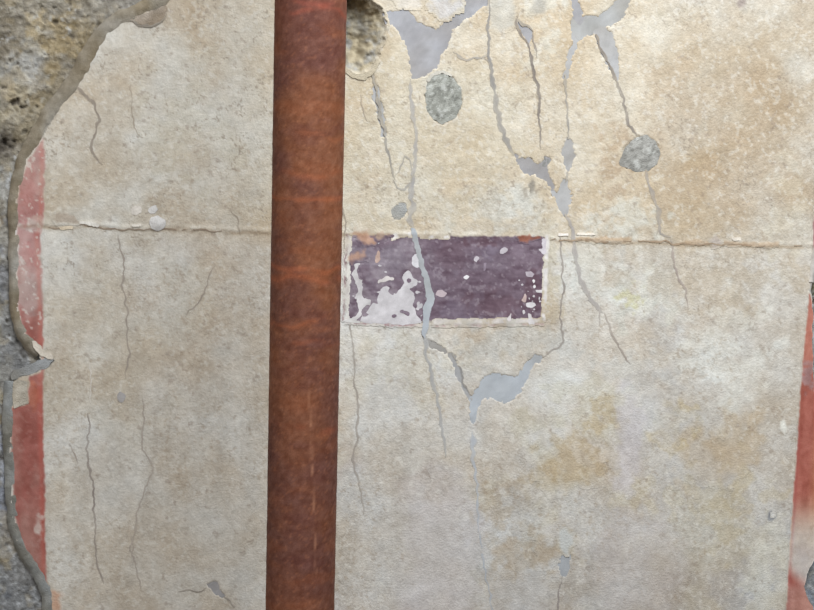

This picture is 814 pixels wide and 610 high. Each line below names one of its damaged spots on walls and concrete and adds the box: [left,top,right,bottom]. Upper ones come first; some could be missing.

crack [340,209,348,258]
crack [360,0,802,457]
peeling [343,243,423,326]
peeling [518,271,542,325]
spalling [11,341,53,409]
crack [349,325,364,514]